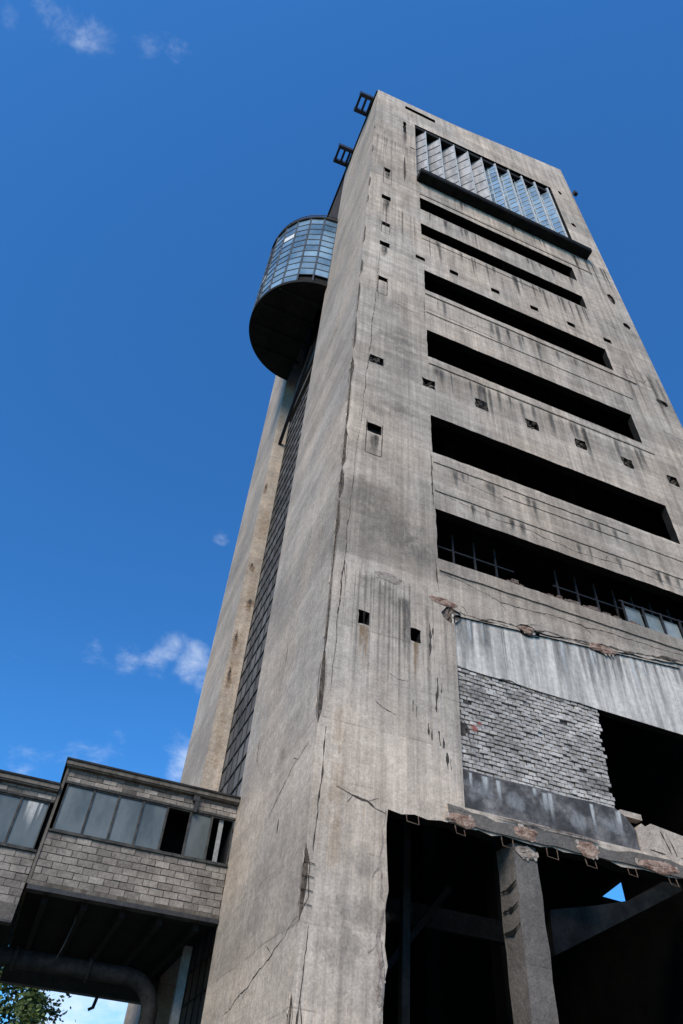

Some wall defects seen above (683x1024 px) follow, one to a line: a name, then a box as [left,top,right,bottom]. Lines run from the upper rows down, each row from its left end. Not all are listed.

crack [330,254,515,691]
spalling [429,596,683,662]
spalling [297,846,315,918]
crack [272,726,386,847]
spalling [445,811,476,829]
spalling [496,816,600,861]
spalling [635,832,683,875]
crack [222,919,309,1024]